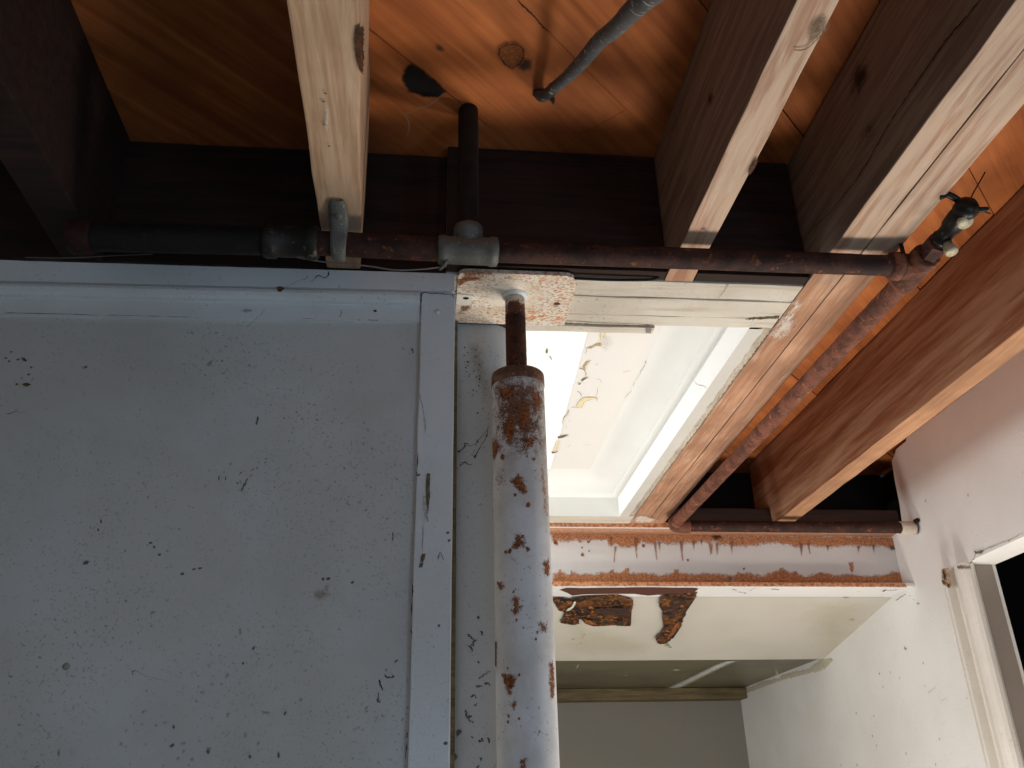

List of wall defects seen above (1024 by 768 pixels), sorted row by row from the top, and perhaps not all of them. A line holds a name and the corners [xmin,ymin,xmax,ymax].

rust [458,269,492,286]
peeling [571,333,605,408]
rust [492,377,547,509]
rust [504,532,530,560]
rust [542,522,907,587]
rust [497,581,524,622]
spalling [553,588,698,644]
rust [495,642,520,724]